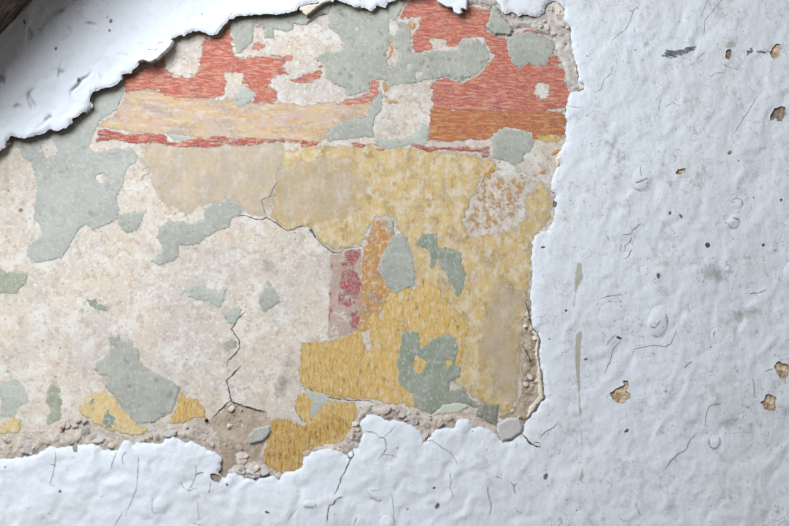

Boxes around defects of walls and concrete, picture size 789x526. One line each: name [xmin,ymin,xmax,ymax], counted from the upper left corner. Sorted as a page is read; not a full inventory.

peeling [770,44,780,61]
peeling [770,107,787,121]
flaking render [0,0,583,486]
crack [212,311,264,418]
peeling [774,361,789,379]
peeling [610,380,630,403]
peeling [760,394,775,411]
crack [327,453,354,520]